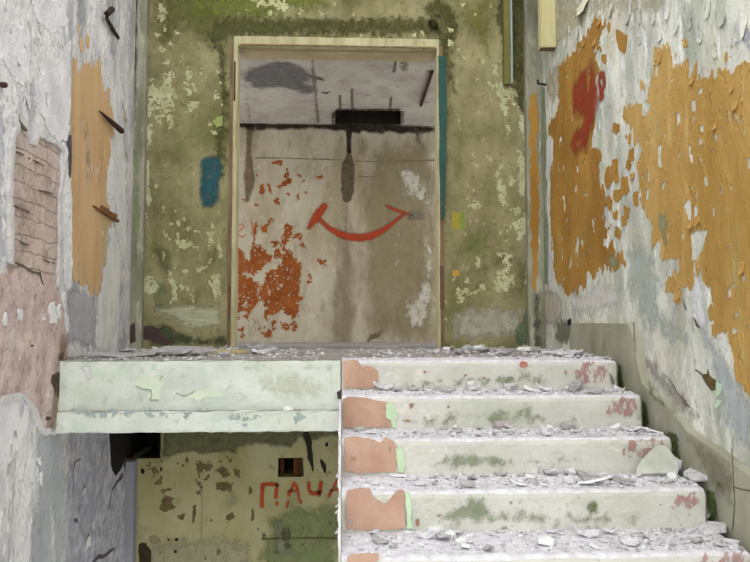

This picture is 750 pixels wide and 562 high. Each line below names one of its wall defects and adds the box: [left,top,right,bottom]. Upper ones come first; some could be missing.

peeling [147,3,203,150]
damp [244,124,255,202]
peeling [256,160,307,205]
damp [341,124,354,202]
peeling [491,0,750,398]
peeling [0,25,168,472]
peeling [163,220,223,304]
peeling [173,218,312,356]
spalling [146,459,196,524]
spalling [177,456,241,495]
peeling [329,360,439,562]
spalling [138,535,162,562]